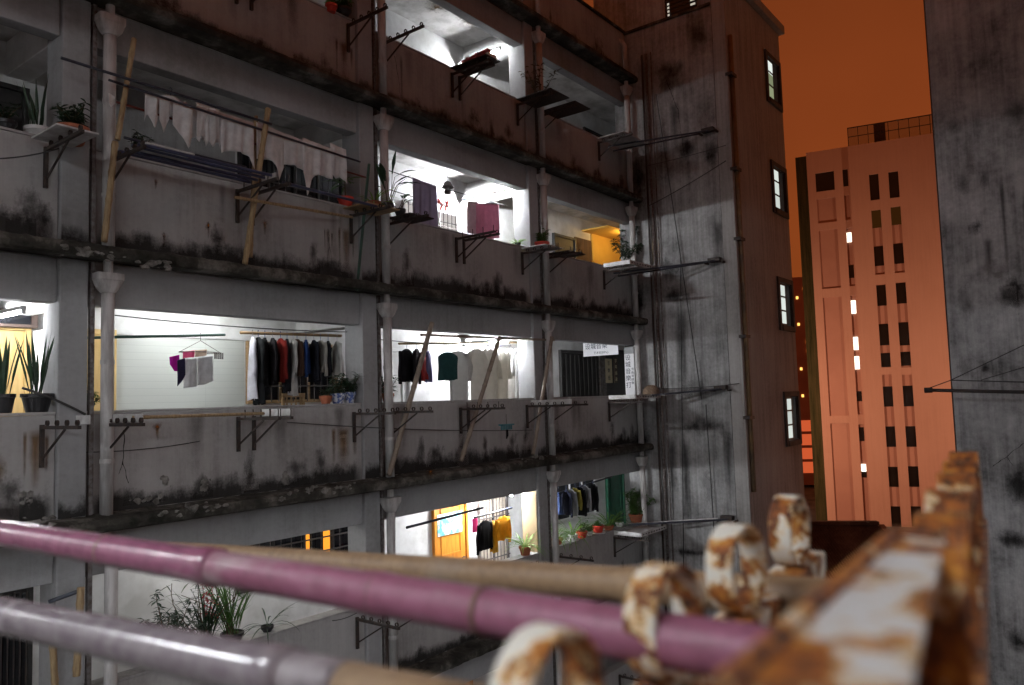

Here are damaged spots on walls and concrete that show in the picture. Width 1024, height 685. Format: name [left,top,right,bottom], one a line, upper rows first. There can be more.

corrosion [703,527,946,685]